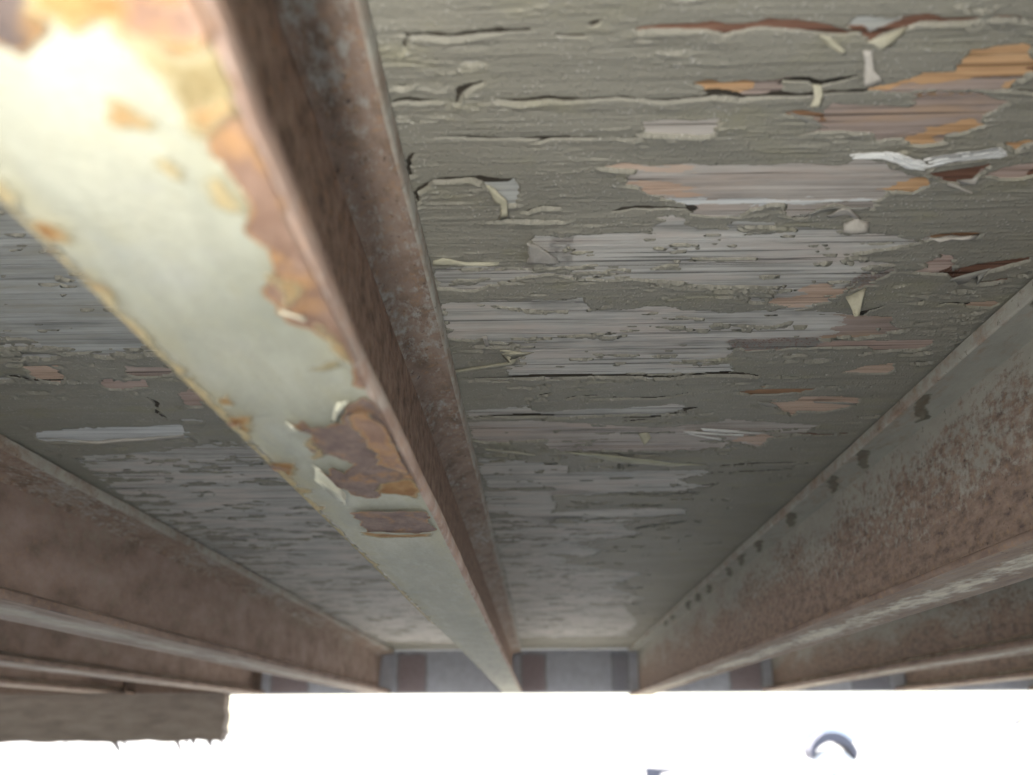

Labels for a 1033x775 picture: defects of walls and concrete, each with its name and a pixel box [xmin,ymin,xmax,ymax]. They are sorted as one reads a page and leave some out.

crack [403,27,531,47]
crack [393,81,483,102]
crack [505,75,869,101]
peeling [785,16,1033,144]
crack [406,153,514,203]
peeling [0,199,146,353]
peeling [432,159,1033,379]
rust [0,0,437,624]
peeling [465,386,859,638]
rust [253,671,309,693]
rust [397,652,427,692]
rust [729,661,763,690]